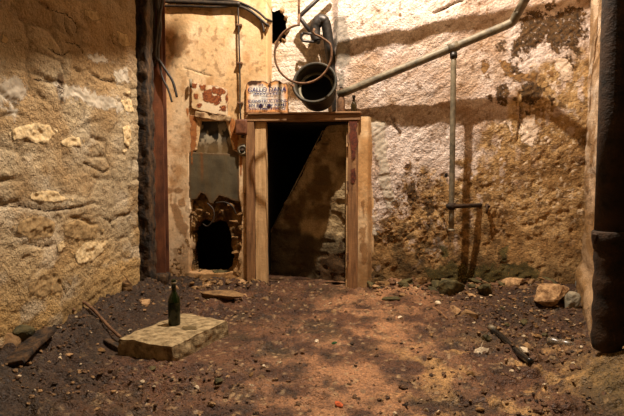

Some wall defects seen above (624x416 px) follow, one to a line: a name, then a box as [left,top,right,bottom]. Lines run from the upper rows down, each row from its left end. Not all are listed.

damp [495,0,589,74]
peeling [487,58,582,147]
spalling [169,193,243,280]